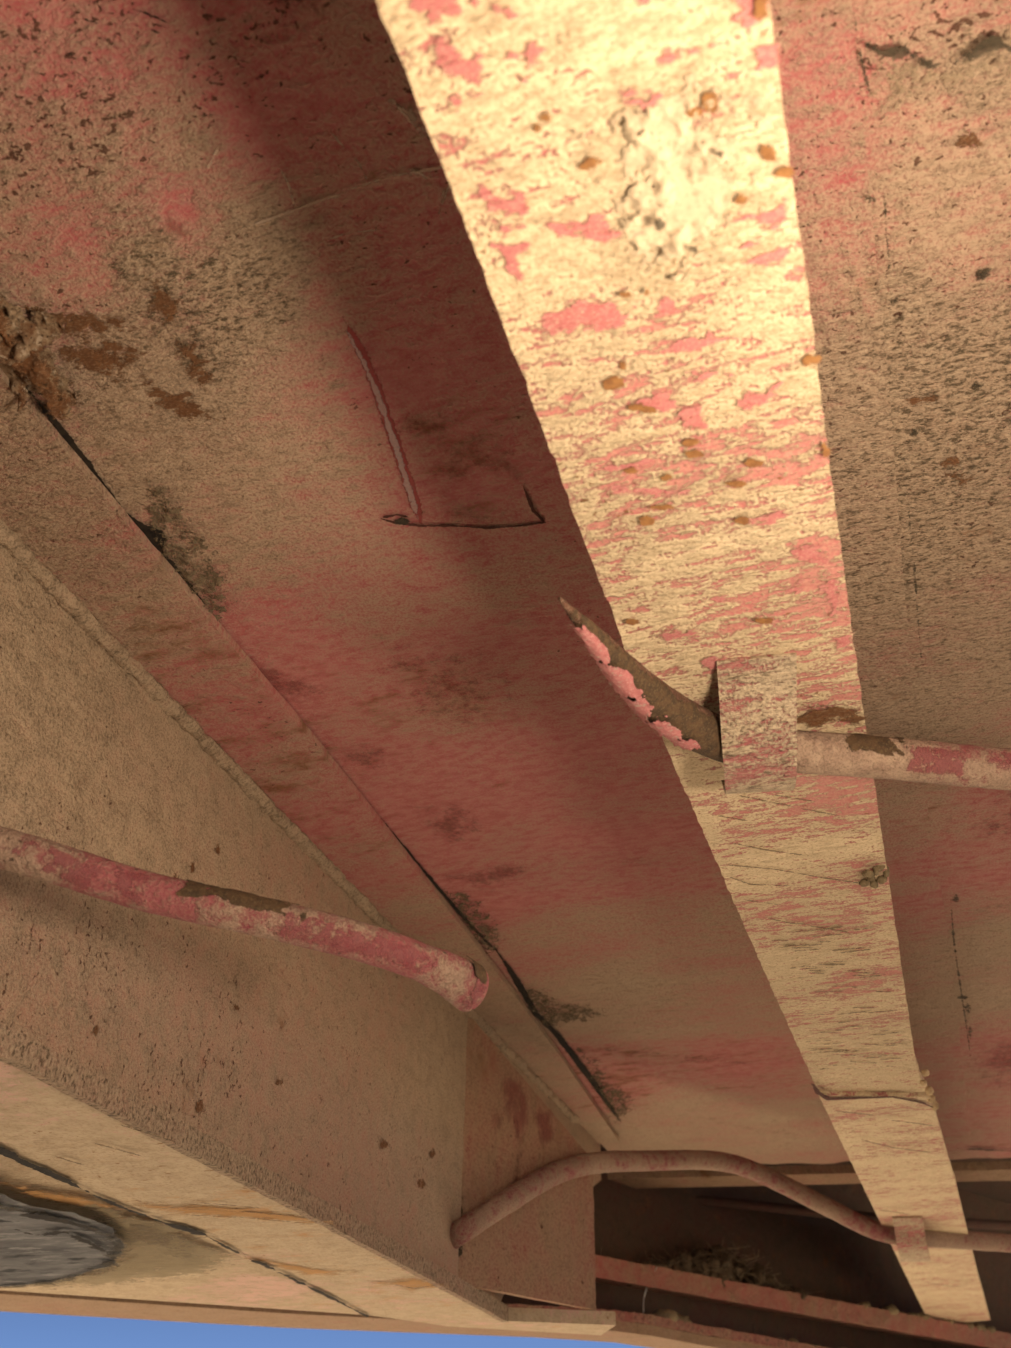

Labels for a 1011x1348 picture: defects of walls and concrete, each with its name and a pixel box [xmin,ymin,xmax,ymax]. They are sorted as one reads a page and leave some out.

peeling [408,0,528,115]
peeling [731,0,789,74]
crack [853,13,873,105]
peeling [477,183,531,289]
peeling [544,213,644,248]
peeling [733,197,802,270]
crack [865,196,892,303]
peeling [541,292,636,338]
peeling [662,330,739,384]
crack [908,511,922,657]
peeling [567,609,723,763]
crack [719,795,1011,1152]